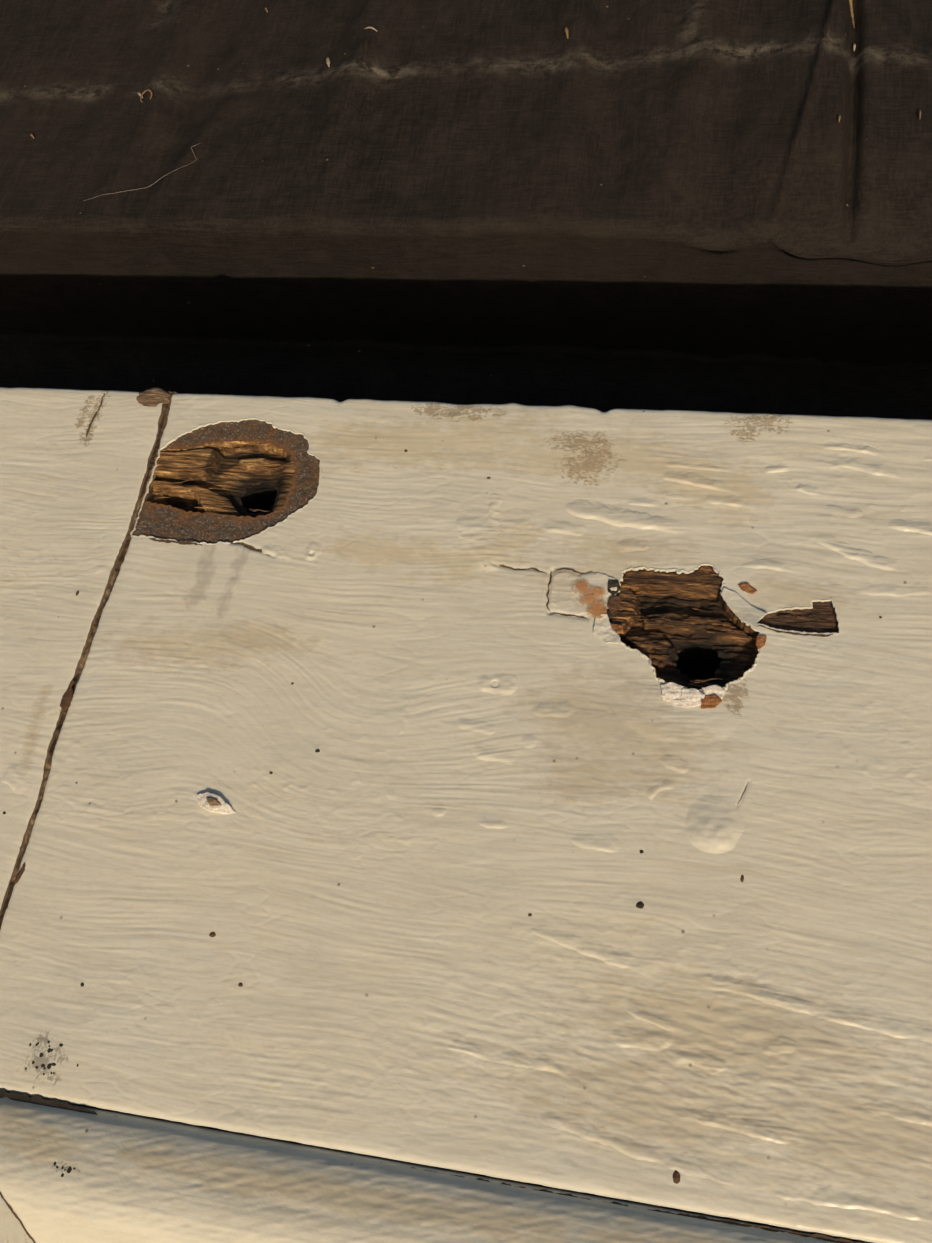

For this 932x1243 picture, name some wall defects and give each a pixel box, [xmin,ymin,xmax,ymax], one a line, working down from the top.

peeling [129,417,322,545]
peeling [551,562,841,709]